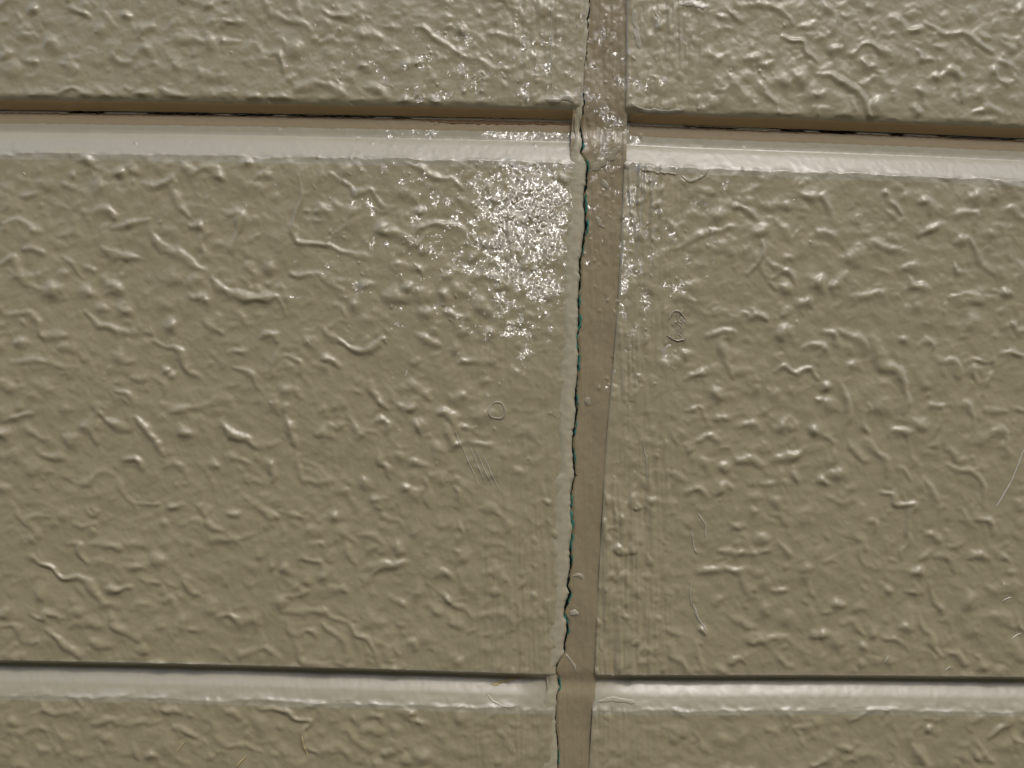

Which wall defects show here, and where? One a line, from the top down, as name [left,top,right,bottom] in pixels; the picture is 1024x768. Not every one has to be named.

crack [555,92,588,768]